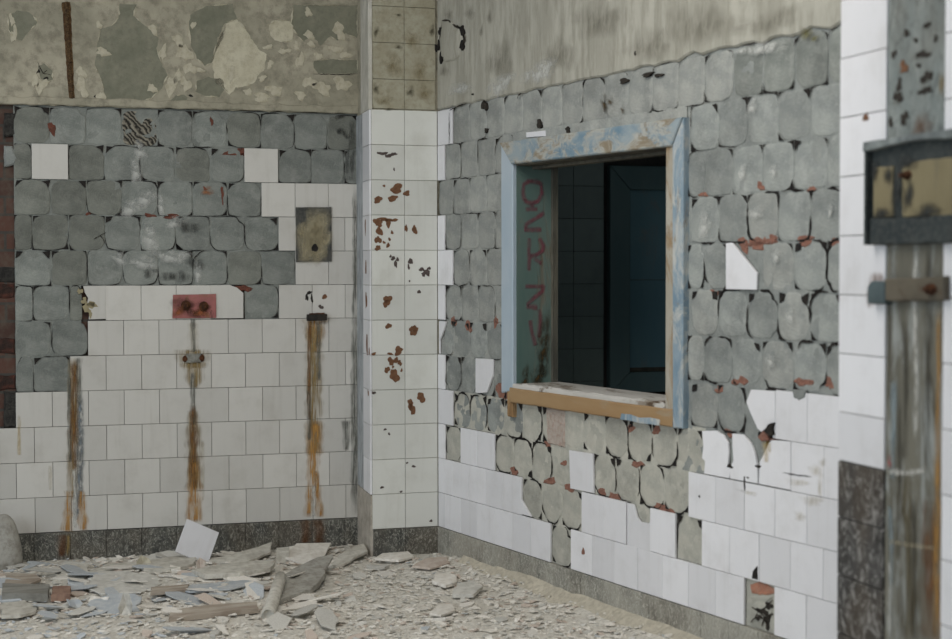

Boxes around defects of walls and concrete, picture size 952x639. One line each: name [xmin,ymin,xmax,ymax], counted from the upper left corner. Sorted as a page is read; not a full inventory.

spalling [888,0,947,139]
spalling [0,4,358,428]
spalling [439,25,842,568]
rust [59,359,86,556]
rust [174,303,205,521]
rust [303,321,322,543]
spalling [746,566,775,634]